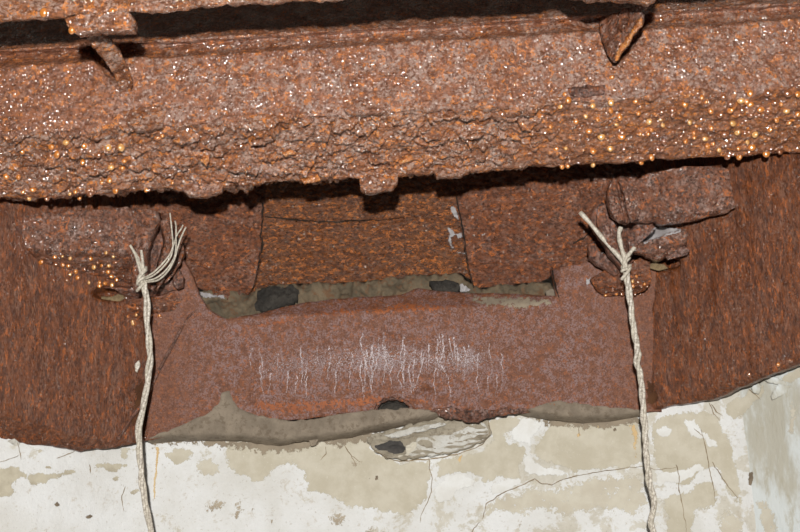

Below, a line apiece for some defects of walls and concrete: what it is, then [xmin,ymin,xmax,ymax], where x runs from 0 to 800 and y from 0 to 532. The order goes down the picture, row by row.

corrosion [615,17,644,62]
corrosion [568,84,606,99]
corrosion [180,183,224,199]
corrosion [360,155,414,195]
corrosion [434,165,471,180]
crack [456,196,474,288]
spalling [254,284,299,313]
spalling [429,279,460,292]
water stain [249,328,503,399]
peeling [164,367,800,532]
peeling [0,466,75,497]
crack [472,465,686,532]